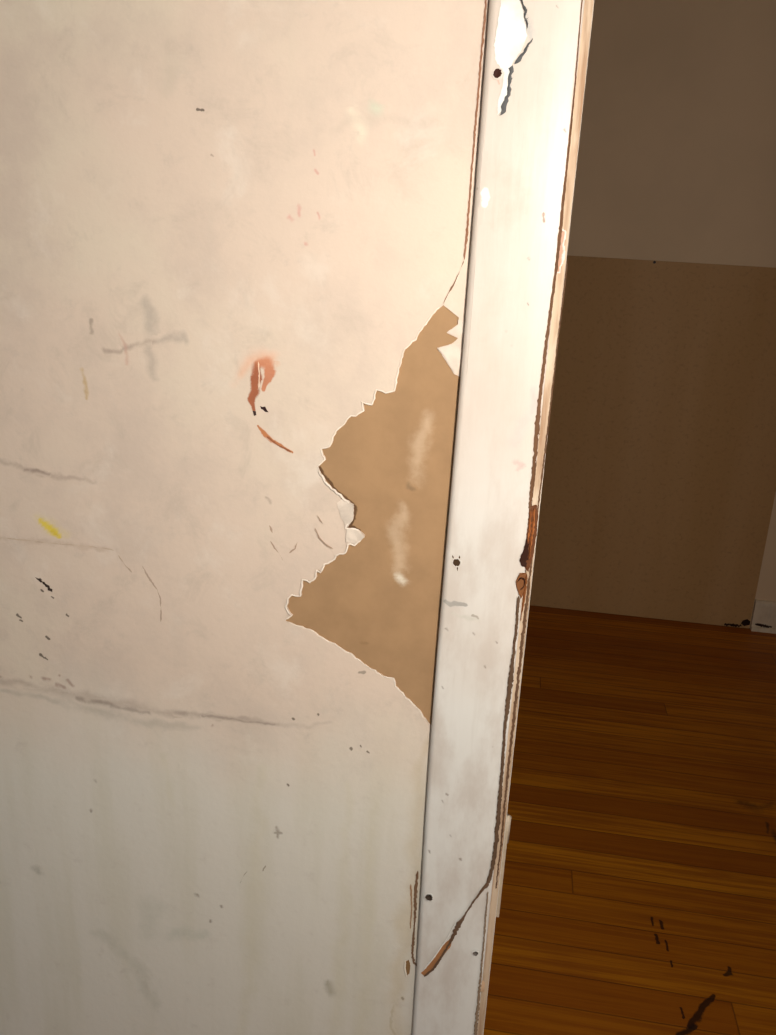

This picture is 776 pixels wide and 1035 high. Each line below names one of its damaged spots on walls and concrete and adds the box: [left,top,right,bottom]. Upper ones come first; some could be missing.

rust [224,339,294,454]
peeling [285,305,464,724]
peeling [494,0,539,118]
spalling [519,535,530,567]
crack [528,0,583,509]
crack [410,559,533,1035]